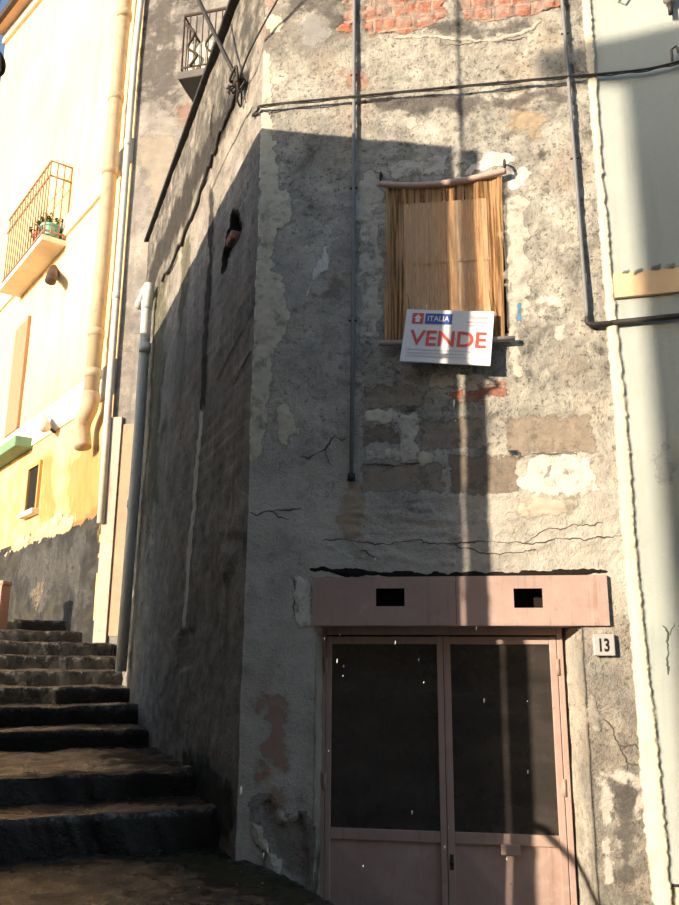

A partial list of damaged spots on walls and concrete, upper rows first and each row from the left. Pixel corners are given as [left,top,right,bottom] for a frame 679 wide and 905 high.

flaking render [336,0,448,38]
flaking render [458,0,561,22]
flaking render [249,51,300,462]
flaking render [428,152,566,404]
crack [300,435,347,467]
flaking render [362,408,600,519]
crack [251,508,301,519]
crack [291,522,621,619]
crack [663,624,675,674]
crack [603,719,640,787]
flaking render [248,793,316,890]
water stain [596,771,644,884]